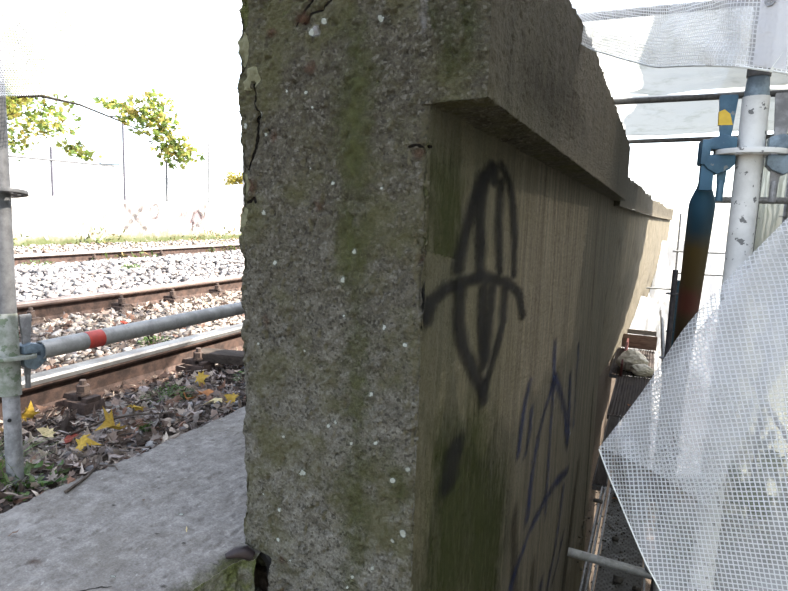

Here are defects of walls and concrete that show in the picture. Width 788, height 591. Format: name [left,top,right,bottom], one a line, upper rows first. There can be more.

crack [296,0,332,27]
crack [248,84,262,170]